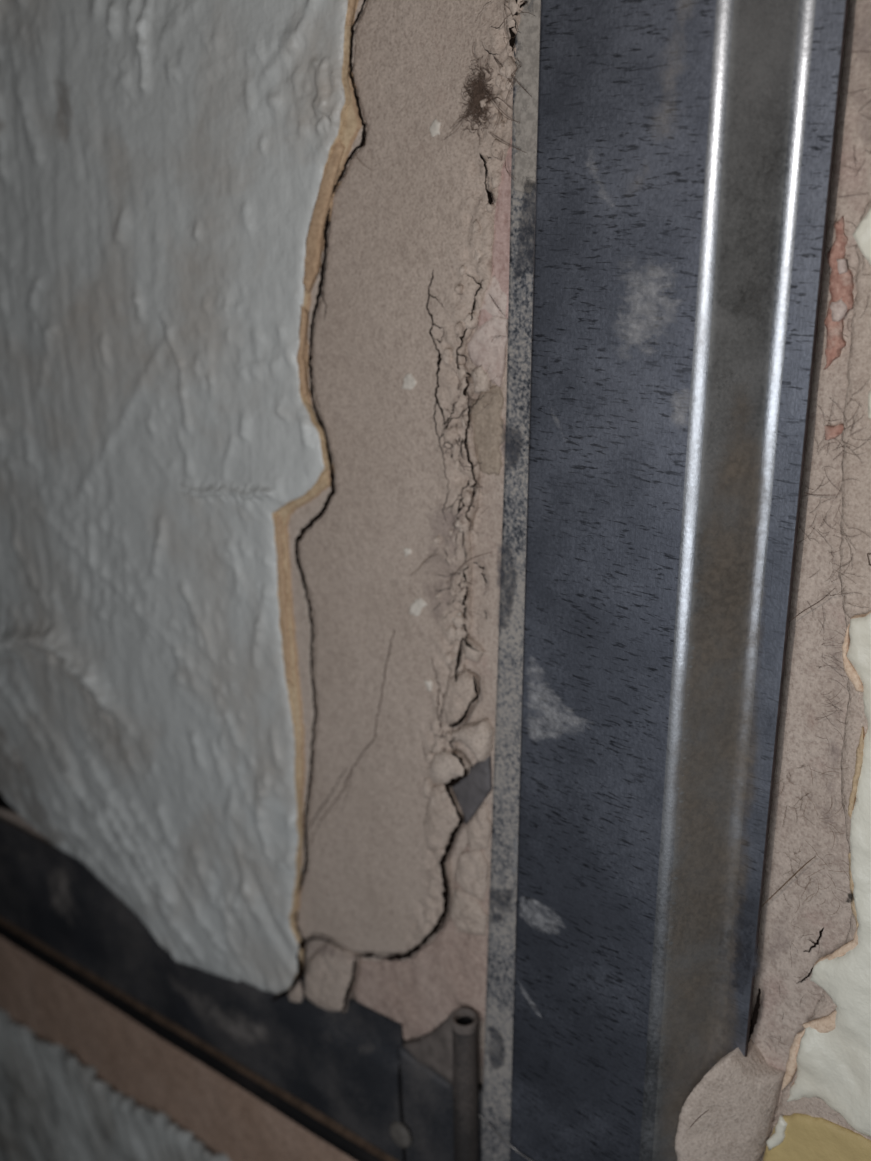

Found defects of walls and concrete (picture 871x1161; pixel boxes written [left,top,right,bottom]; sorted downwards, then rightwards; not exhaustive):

peeling [297,0,362,408]
crack [480,154,493,205]
flaking render [467,139,512,475]
crack [477,0,527,55]
crack [271,0,487,1013]
peeling [275,455,334,975]
flaking render [354,803,492,1040]
crack [798,928,824,983]
peeling [781,611,871,1137]
peeling [766,1115,787,1150]